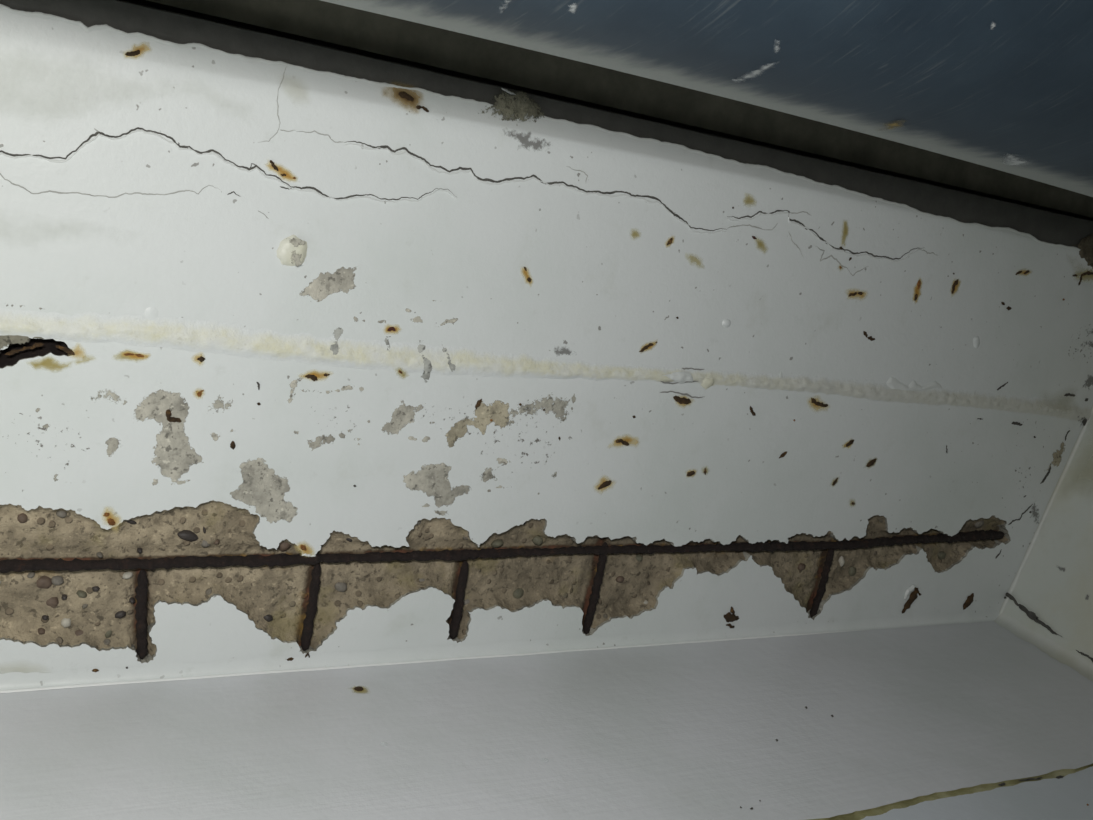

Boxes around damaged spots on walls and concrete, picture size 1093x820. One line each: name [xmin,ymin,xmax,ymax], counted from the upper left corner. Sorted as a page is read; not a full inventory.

corrosion [268,160,296,180]
crack [0,68,935,276]
peeling [300,267,357,302]
spalling [0,335,75,368]
corrosion [31,347,90,370]
peeling [91,389,204,486]
peeling [446,394,576,447]
corrosion [298,544,316,557]
spalling [0,458,1008,656]
corrosion [724,606,739,628]
corrosion [902,585,921,614]
crack [1004,592,1093,662]